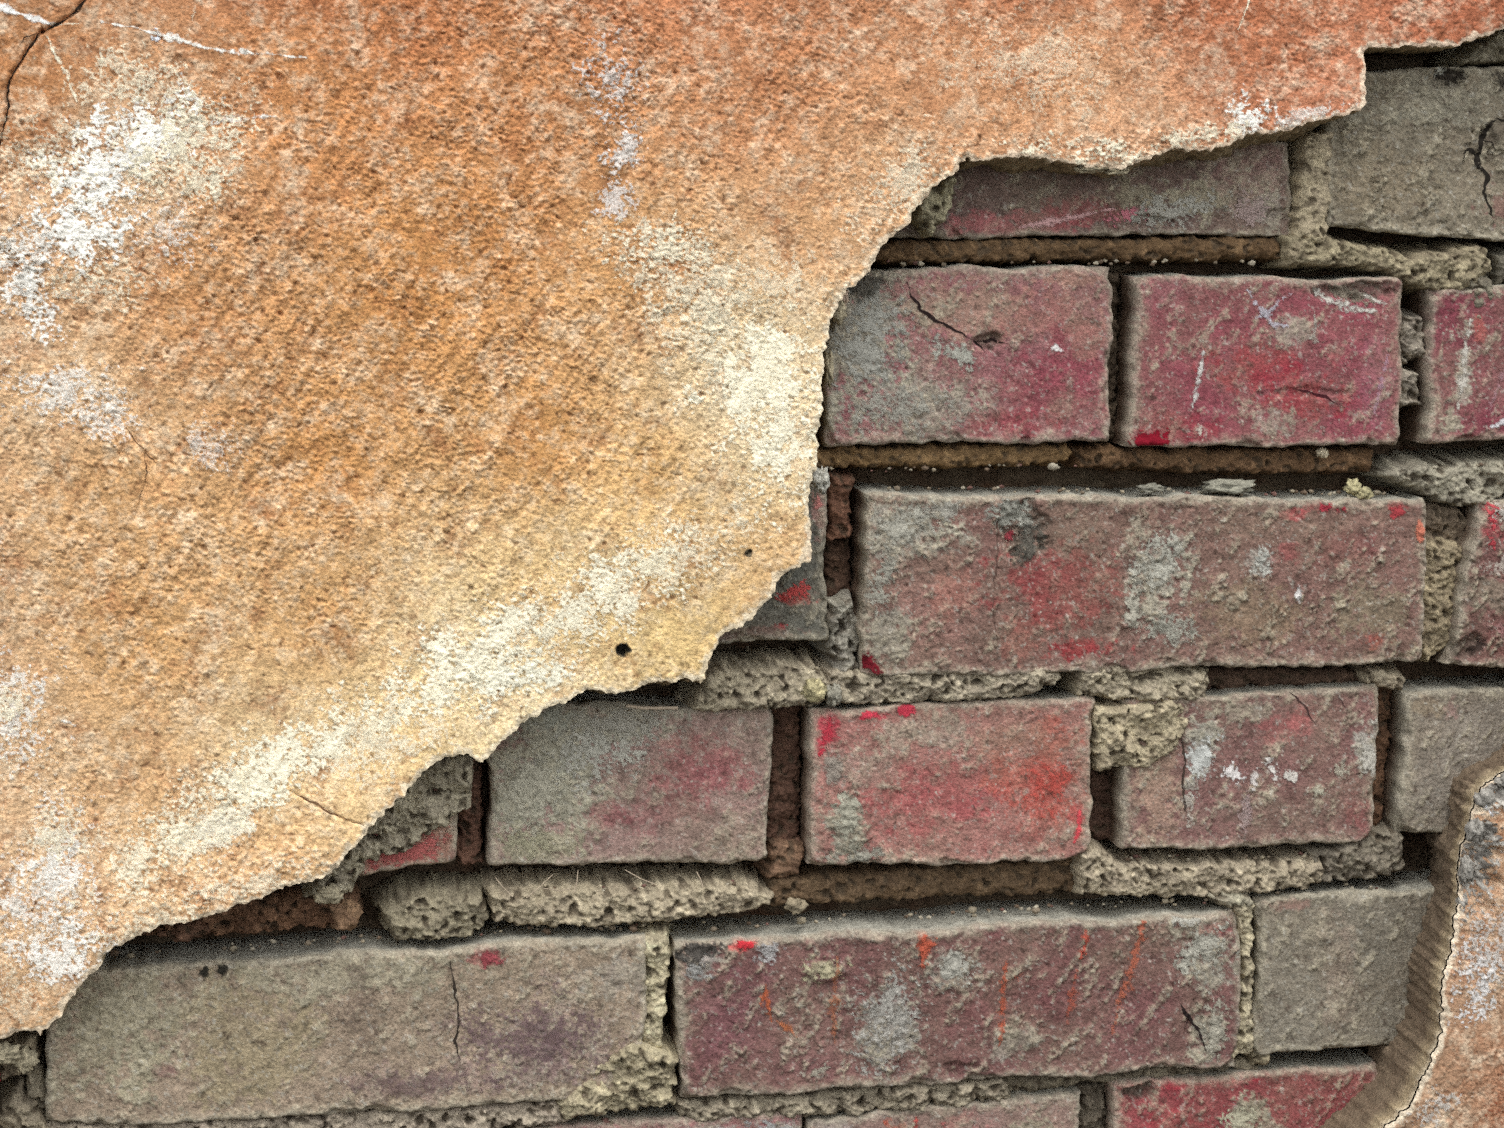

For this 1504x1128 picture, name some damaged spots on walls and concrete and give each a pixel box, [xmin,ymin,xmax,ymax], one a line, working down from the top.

crack [0,0,85,145]
spalling [1364,29,1504,86]
peeling [0,42,272,347]
spalling [926,110,1359,198]
peeling [1019,187,1272,235]
peeling [642,245,983,538]
peeling [1121,530,1201,647]
peeling [0,644,234,1081]
spalling [675,941,785,980]
peeling [802,949,981,1086]
spalling [1172,916,1240,1063]
spalling [1319,743,1504,1128]